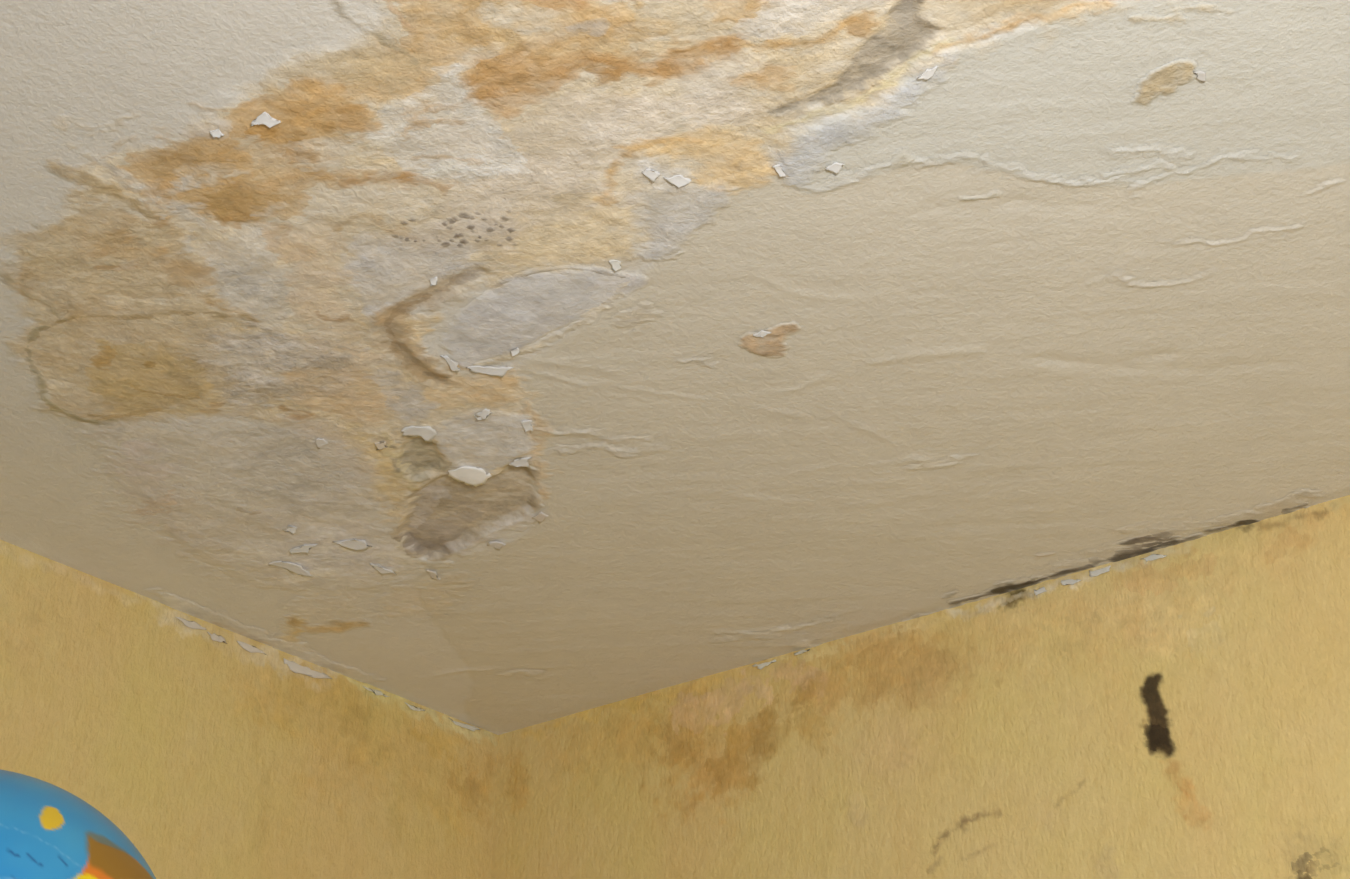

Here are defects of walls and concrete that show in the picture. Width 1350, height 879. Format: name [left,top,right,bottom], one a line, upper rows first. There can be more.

peeling [251,112,281,128]
peeling [760,0,965,189]
peeling [1130,57,1206,106]
peeling [438,168,745,378]
damp [0,0,1238,646]
peeling [737,321,804,359]
spalling [372,406,548,580]
damp [210,488,1350,865]